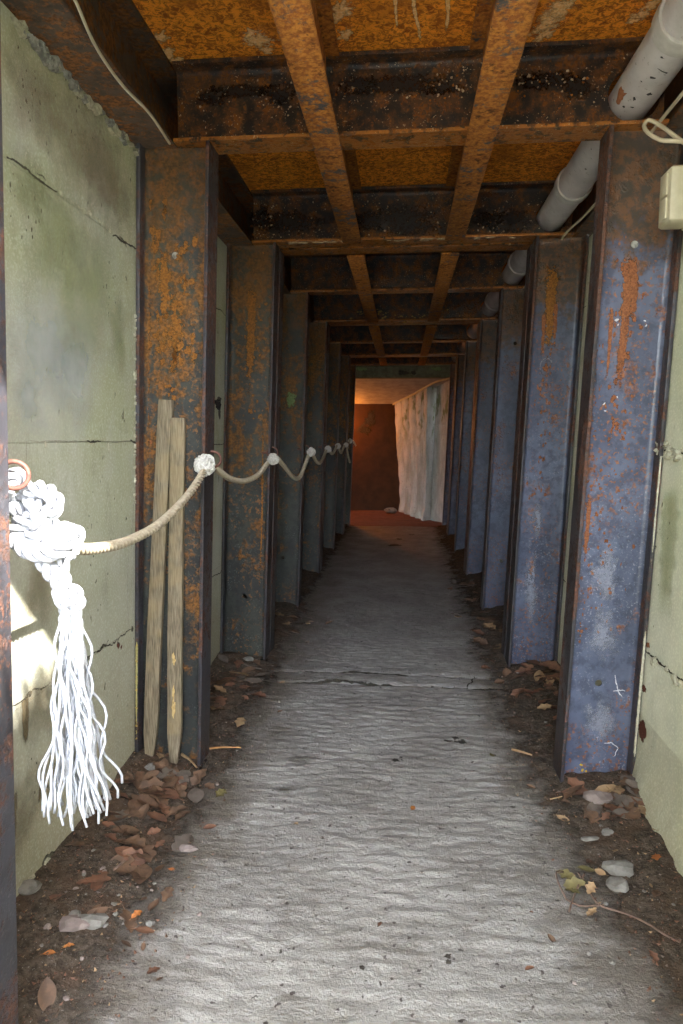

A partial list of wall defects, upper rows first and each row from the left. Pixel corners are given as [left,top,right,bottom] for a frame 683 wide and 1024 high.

peeling [10,16,139,156]
crack [7,157,136,249]
crack [26,439,136,459]
rust [147,197,200,500]
rust [244,288,268,584]
rust [526,266,561,500]
rust [592,254,645,442]
rust [577,455,617,643]
crack [13,682,51,706]
crack [87,626,134,660]
crack [646,652,683,688]